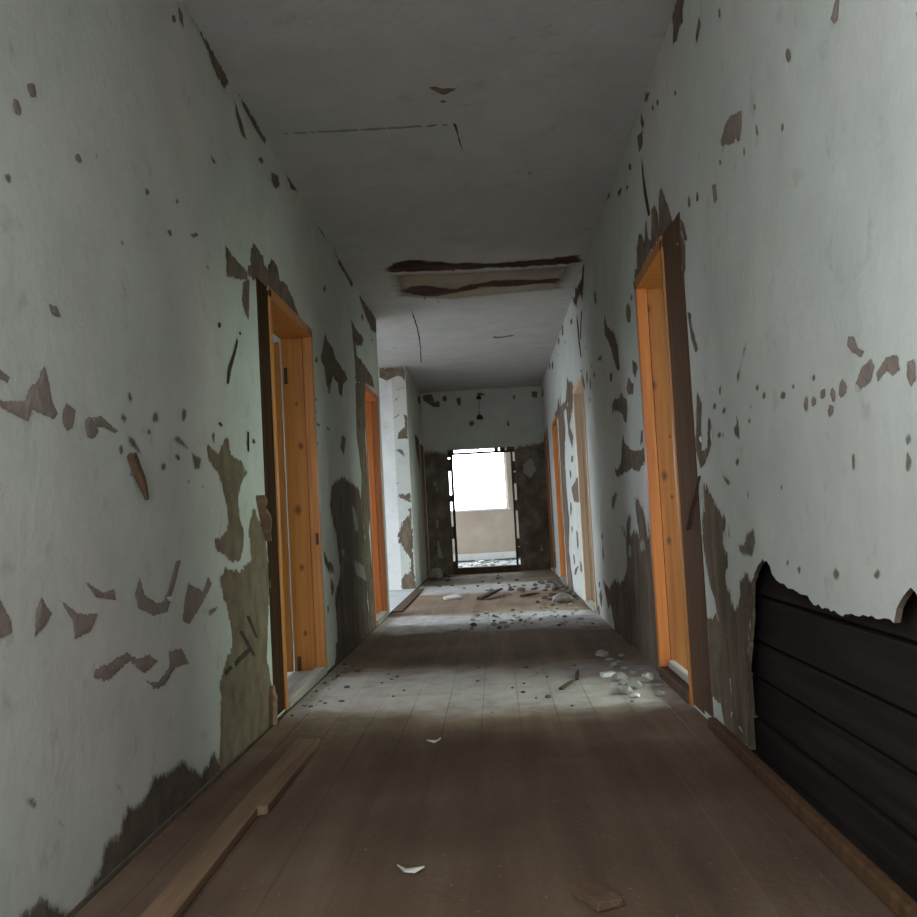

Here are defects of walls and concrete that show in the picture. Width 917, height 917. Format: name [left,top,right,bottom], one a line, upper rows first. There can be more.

flaking render [719,110,745,165]
flaking render [225,244,300,320]
flaking render [626,189,687,322]
flaking render [0,366,76,430]
flaking render [804,336,916,417]
flaking render [315,295,405,664]
flaking render [614,431,645,476]
flaking render [135,559,181,616]
flaking render [175,425,271,772]
flaking render [595,497,659,672]
flaking render [94,648,188,689]
spalling [702,484,917,902]